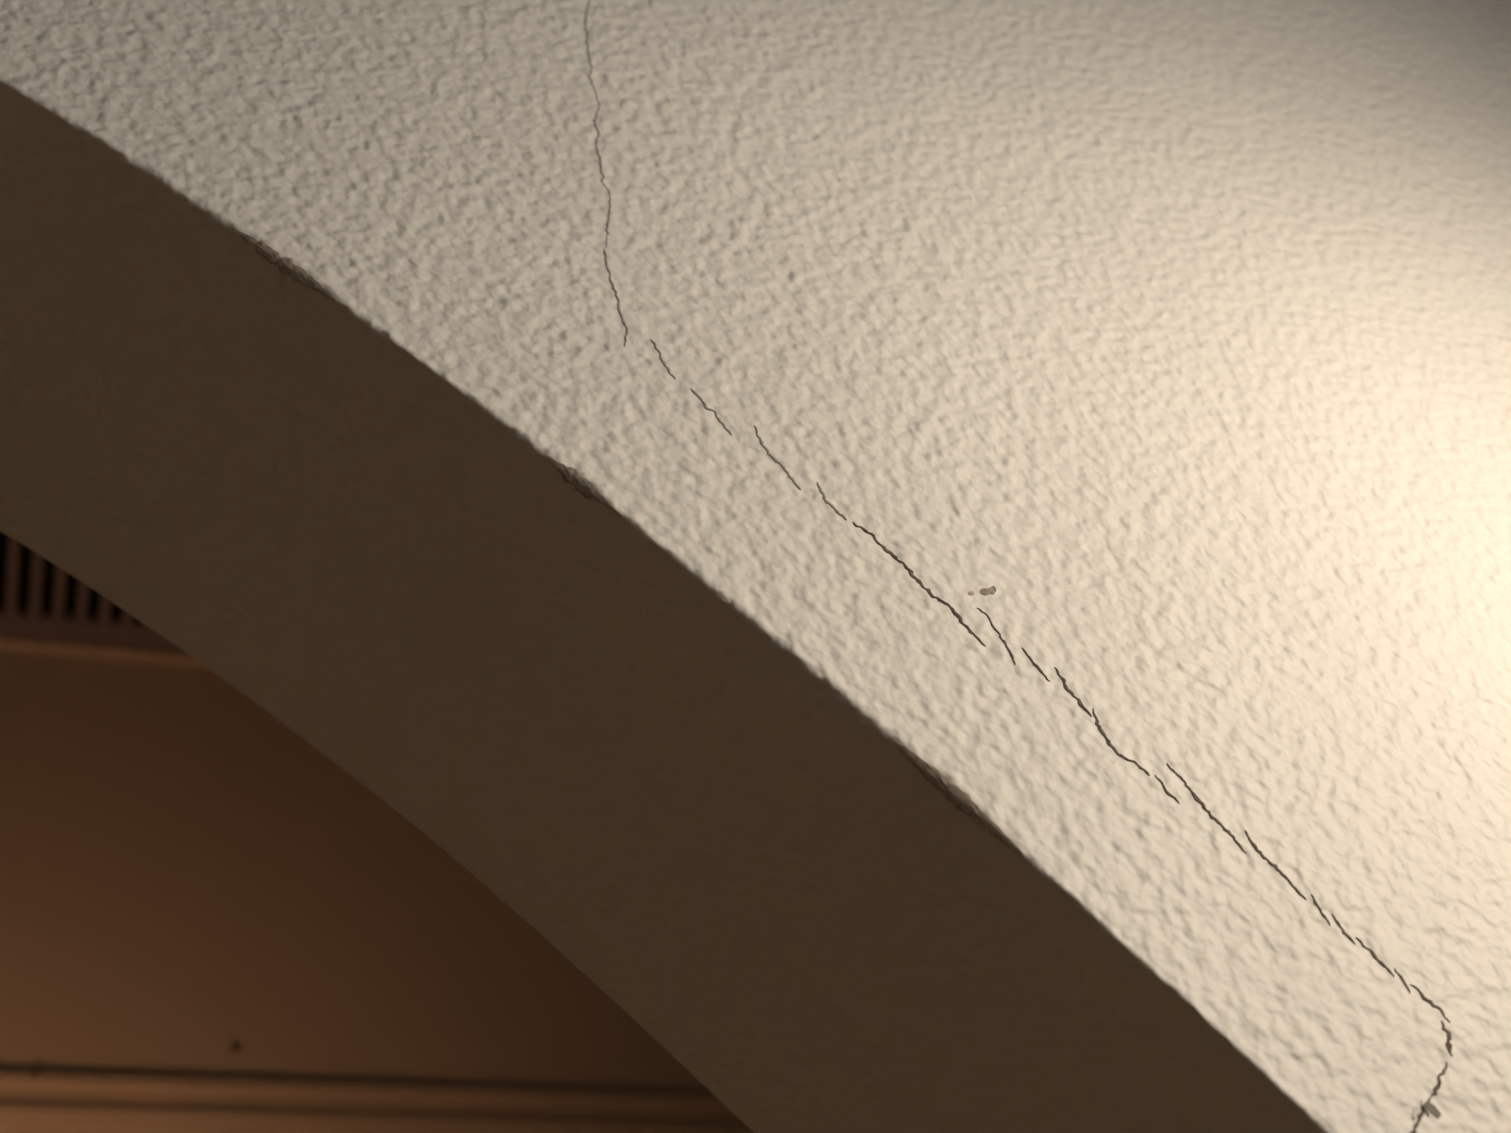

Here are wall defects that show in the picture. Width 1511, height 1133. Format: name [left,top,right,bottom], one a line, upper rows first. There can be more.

crack [584,0,1452,1133]